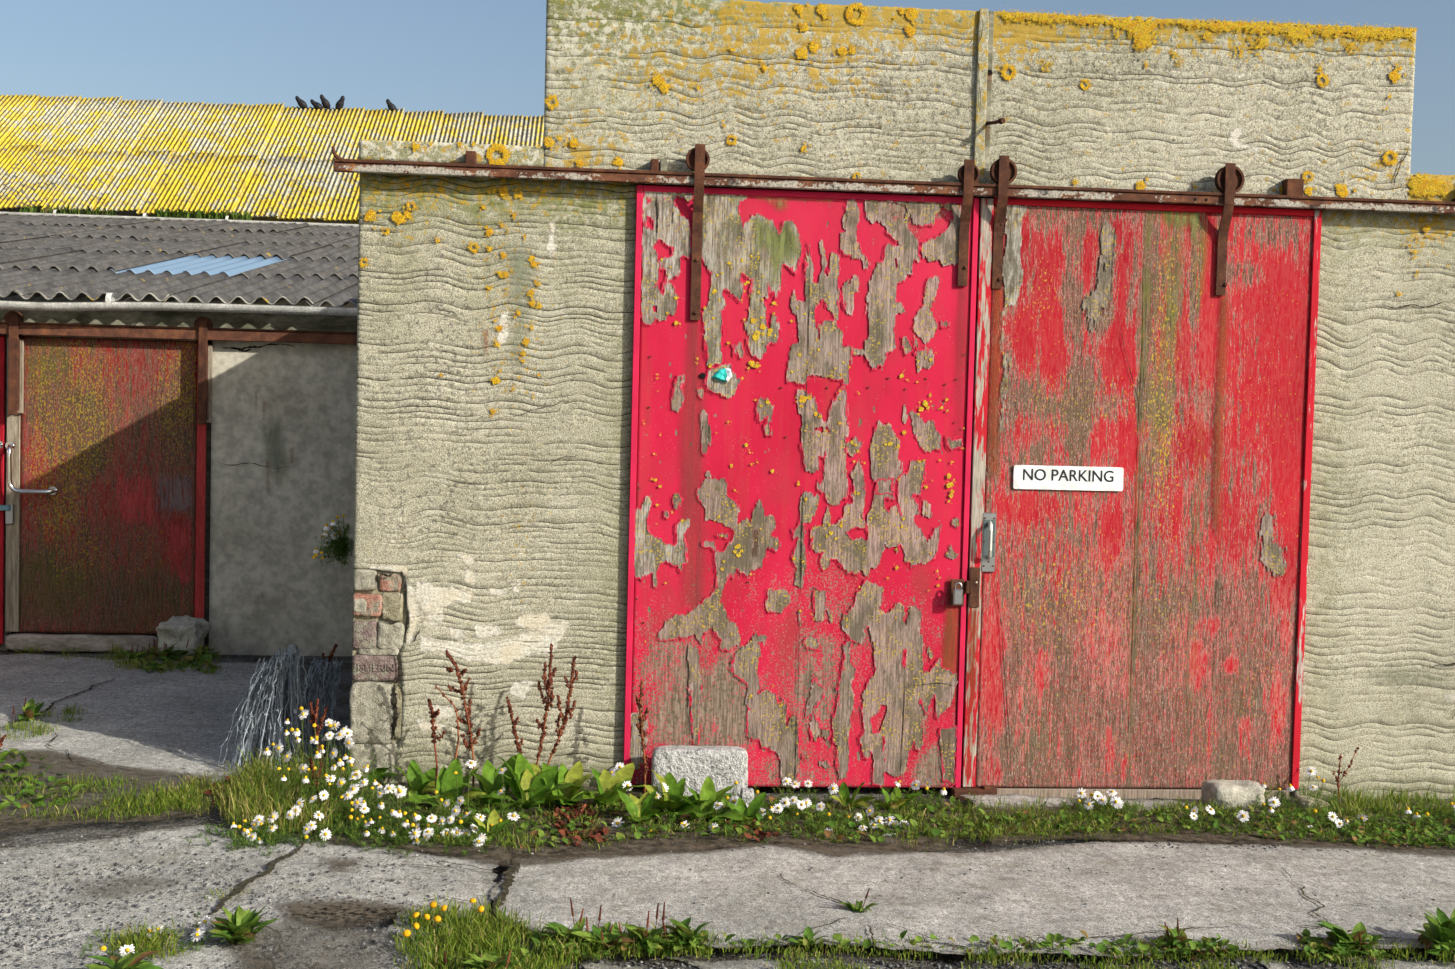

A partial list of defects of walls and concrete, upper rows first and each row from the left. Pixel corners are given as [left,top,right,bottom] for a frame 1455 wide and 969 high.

peeling [1081,221,1118,333]
peeling [986,205,1027,476]
peeling [633,190,963,788]
peeling [1259,512,1287,582]
peeling [629,712,650,771]
crack [206,841,304,969]
crack [350,858,521,915]